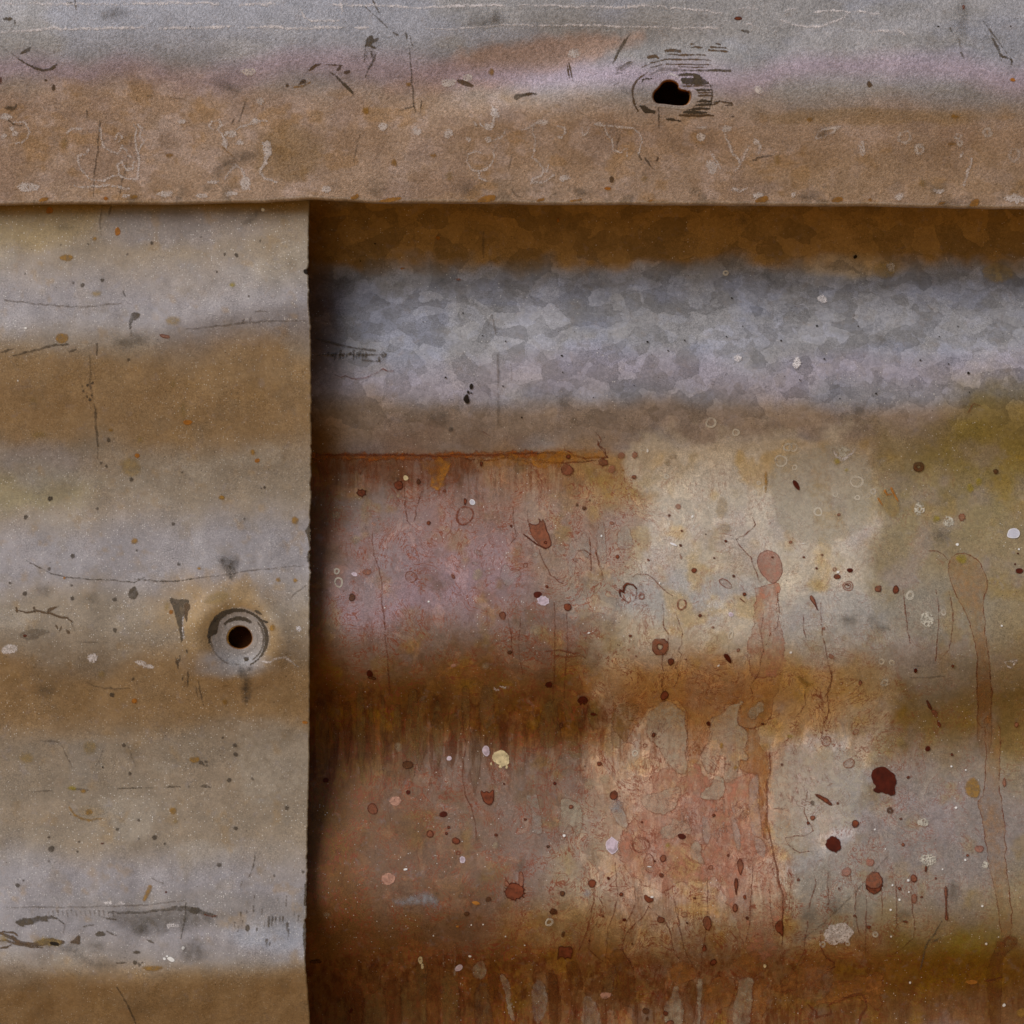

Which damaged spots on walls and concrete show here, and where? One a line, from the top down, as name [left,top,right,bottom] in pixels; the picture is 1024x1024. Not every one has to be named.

corrosion [311,443,637,492]
corrosion [523,519,552,549]
corrosion [652,639,687,666]
corrosion [480,783,505,805]
corrosion [871,767,910,820]
corrosion [948,553,1016,999]
corrosion [427,811,460,855]
corrosion [618,723,786,960]
corrosion [825,836,841,853]
corrosion [504,872,526,901]
corrosion [865,859,883,894]
corrosion [898,866,948,921]